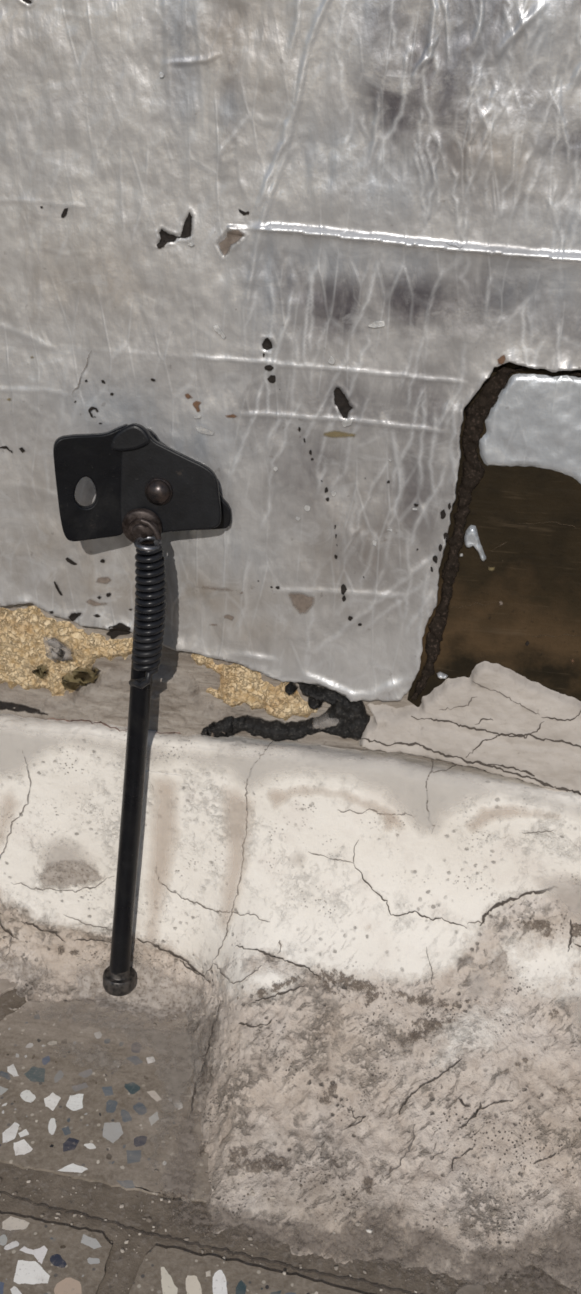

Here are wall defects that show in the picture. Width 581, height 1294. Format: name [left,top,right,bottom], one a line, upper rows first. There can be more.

peeling [157,212,194,249]
peeling [431,503,494,572]
spalling [0,605,133,696]
spalling [191,653,337,721]
crack [309,682,581,929]
crack [0,741,319,1152]
crack [568,919,581,951]
crack [309,1108,366,1159]
crack [385,1059,513,1176]